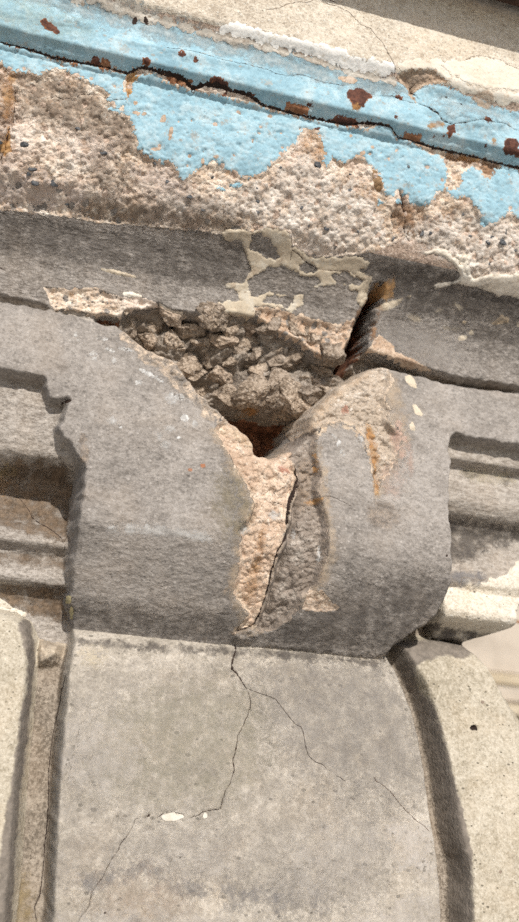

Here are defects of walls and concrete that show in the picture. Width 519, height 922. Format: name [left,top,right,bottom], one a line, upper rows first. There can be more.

rust [90,55,151,98]
rust [209,75,228,97]
rust [0,72,16,156]
rust [284,100,313,116]
rust [315,88,373,130]
rust [403,122,456,144]
rust [445,153,498,176]
spalling [0,0,519,642]
crack [291,234,372,379]
crack [79,468,345,920]